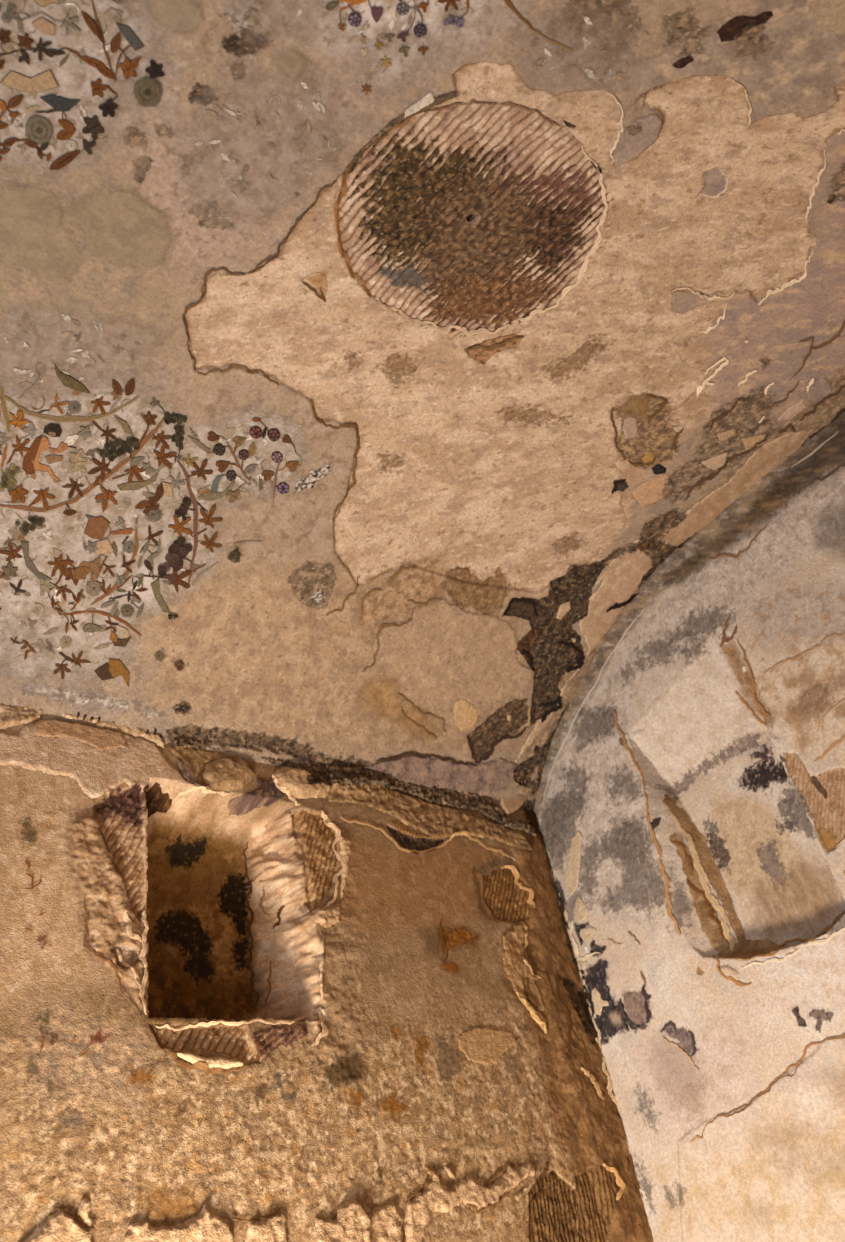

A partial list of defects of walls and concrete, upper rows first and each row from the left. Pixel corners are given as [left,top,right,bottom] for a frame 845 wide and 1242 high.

flaking render [182,62,845,763]
crack [764,321,845,447]
crack [606,533,696,612]
crack [537,703,569,787]
water stain [523,607,760,928]
water stain [756,788,832,936]
flaking render [68,782,352,1074]
water stain [556,903,699,1071]
water stain [792,1006,833,1032]
crack [691,1034,845,1142]
flaking render [124,1203,287,1242]
flaking render [310,1161,625,1242]